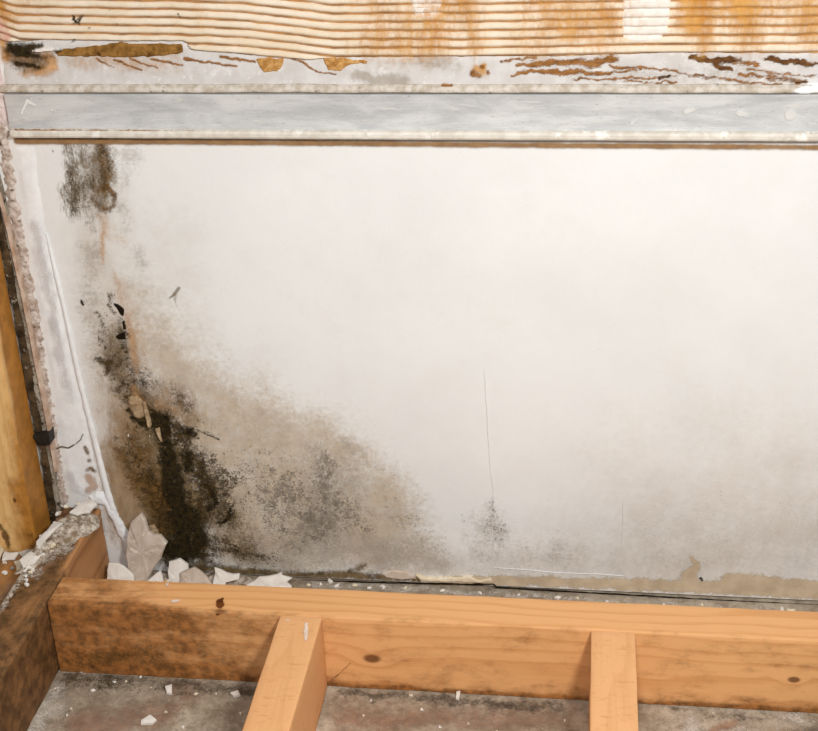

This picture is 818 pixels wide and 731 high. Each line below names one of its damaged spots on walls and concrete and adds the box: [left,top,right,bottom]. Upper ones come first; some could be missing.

water stain [60,138,117,215]
water stain [95,290,420,582]
peeling [382,556,818,599]